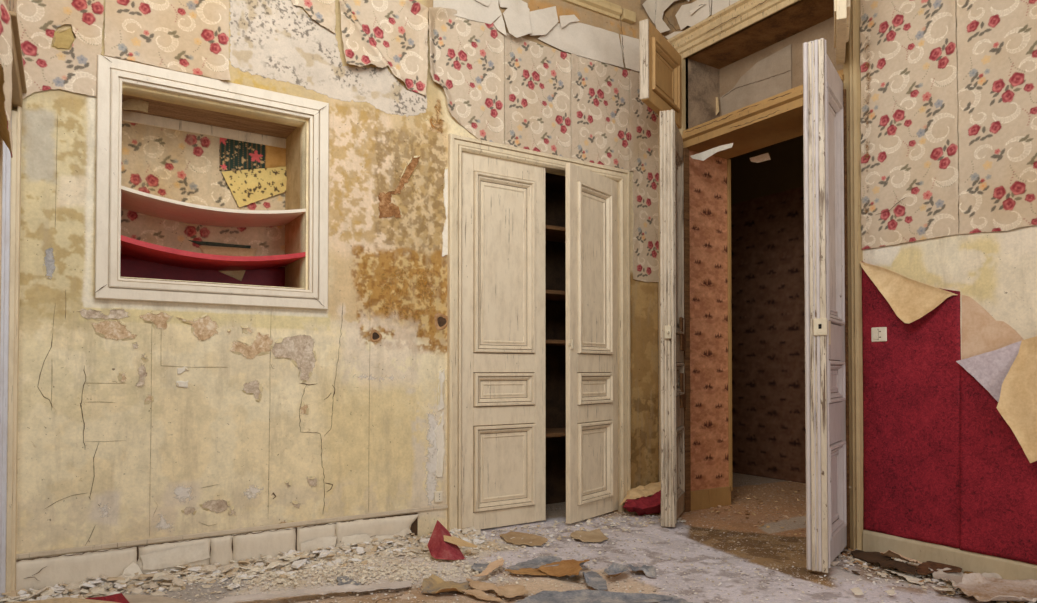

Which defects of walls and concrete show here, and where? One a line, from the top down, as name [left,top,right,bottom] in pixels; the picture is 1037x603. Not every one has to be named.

flaking render [229,0,427,117]
peeling [642,0,739,39]
spalling [78,308,317,404]
crack [16,289,418,581]